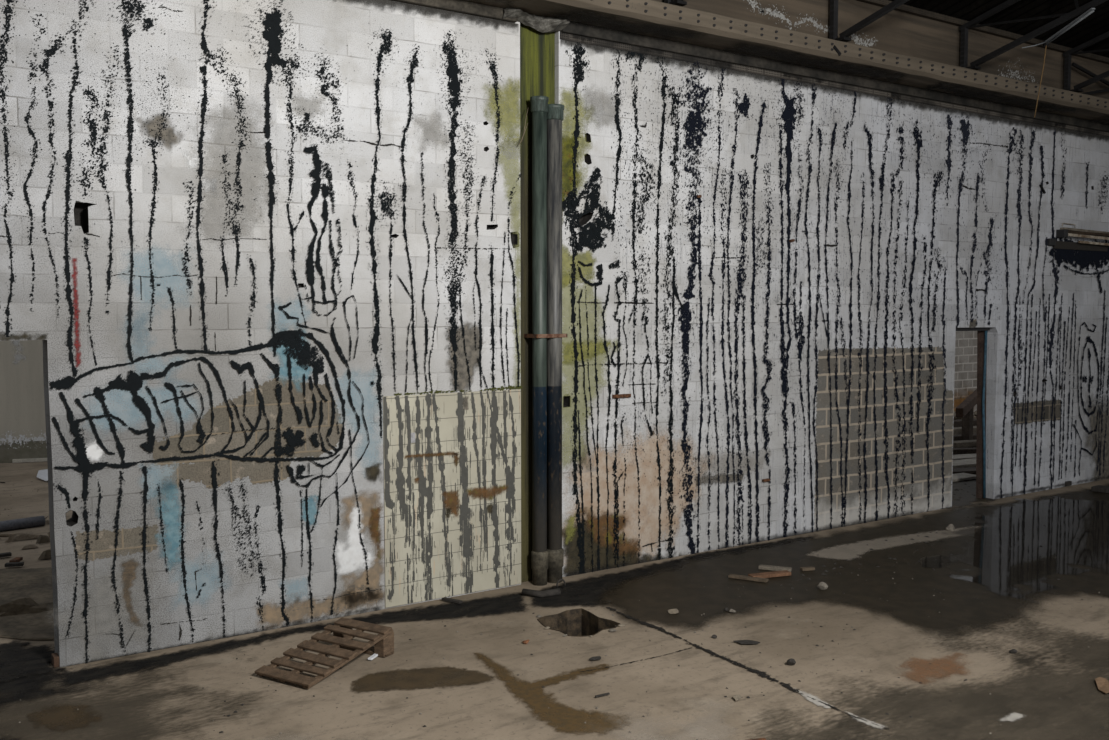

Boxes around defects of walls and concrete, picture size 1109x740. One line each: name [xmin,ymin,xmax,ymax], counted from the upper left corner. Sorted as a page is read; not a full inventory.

damp [743,0,830,33]
damp [143,115,178,147]
spalling [74,203,93,233]
damp [273,334,312,388]
damp [447,323,480,390]
damp [0,440,47,463]
damp [366,464,380,481]
rust [405,452,459,466]
rust [443,485,507,518]
rust [563,435,698,564]
damp [562,403,1109,636]
peeling [336,494,384,608]